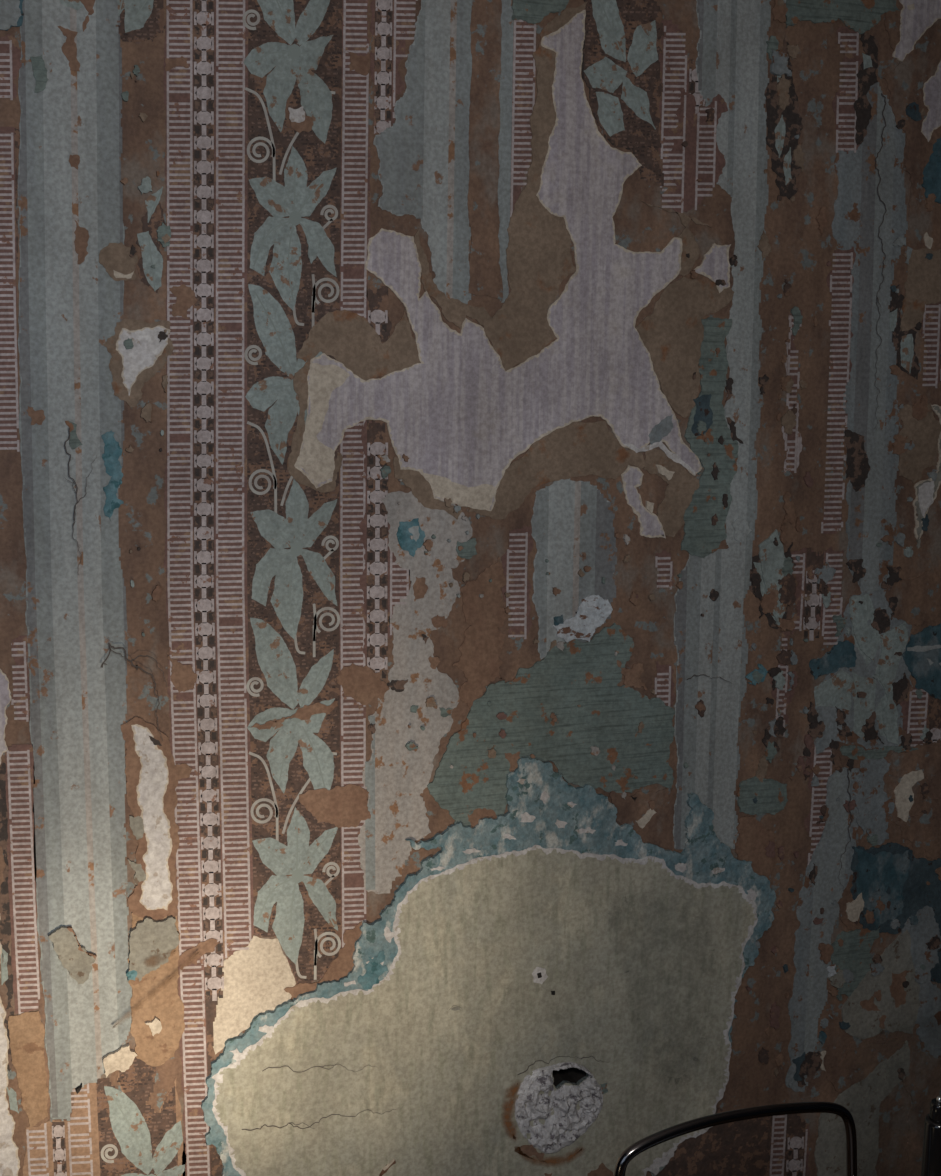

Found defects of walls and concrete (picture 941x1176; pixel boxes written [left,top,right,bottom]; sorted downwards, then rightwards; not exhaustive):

flaking render [894,0,941,60]
flaking render [288,106,305,123]
peeling [766,36,793,110]
flaking render [896,62,941,142]
flaking render [312,13,744,519]
flaking render [614,467,665,545]
peeling [552,554,613,651]
flaking render [126,725,179,982]
peeling [636,808,657,828]
crack [262,1062,372,1072]
crack [242,1109,396,1131]
spalling [515,1062,608,1176]